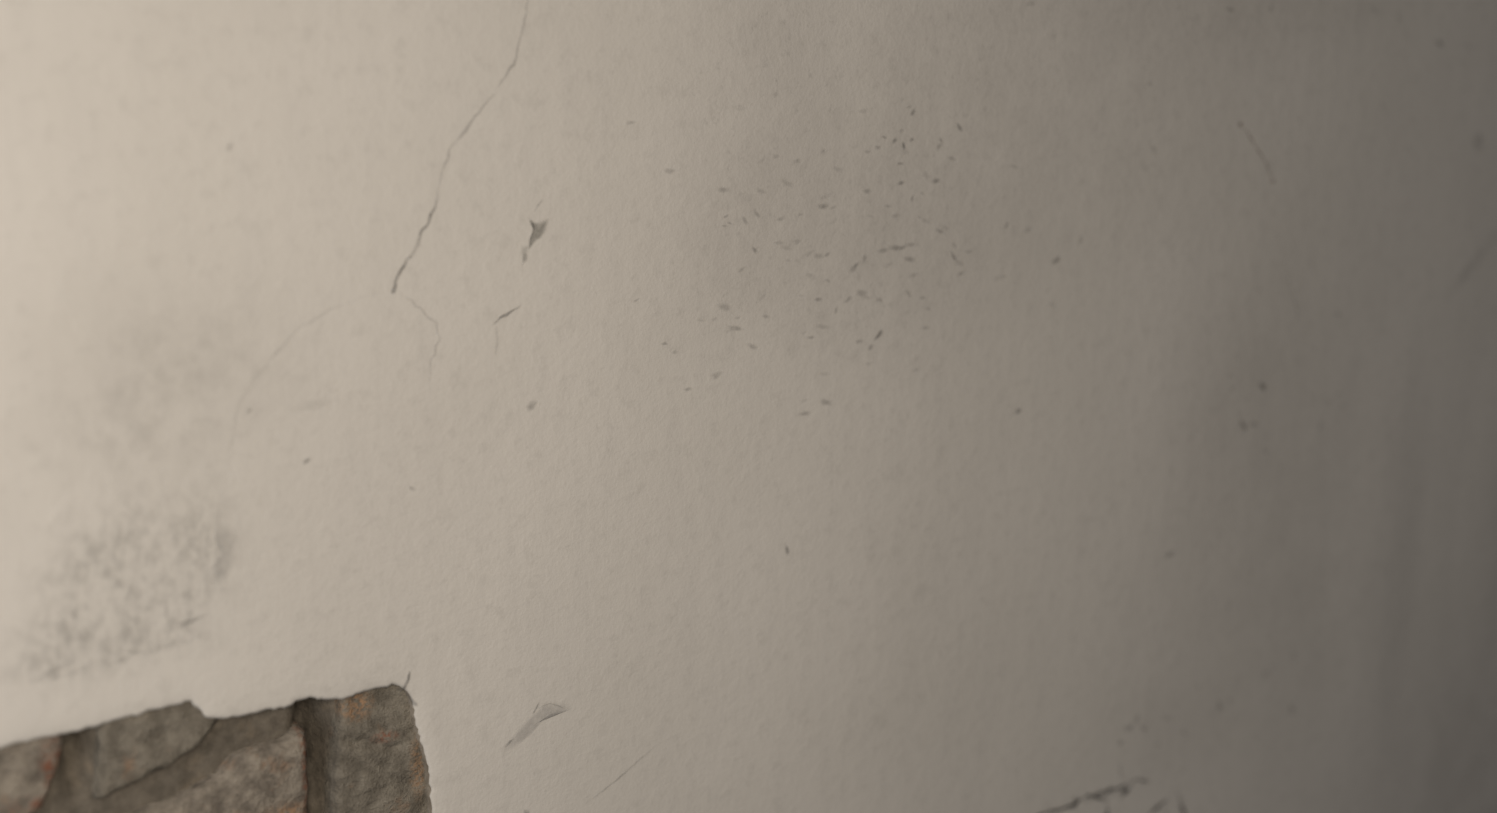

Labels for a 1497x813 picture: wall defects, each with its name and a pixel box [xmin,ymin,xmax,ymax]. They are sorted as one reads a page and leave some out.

flaking render [0,684,428,813]